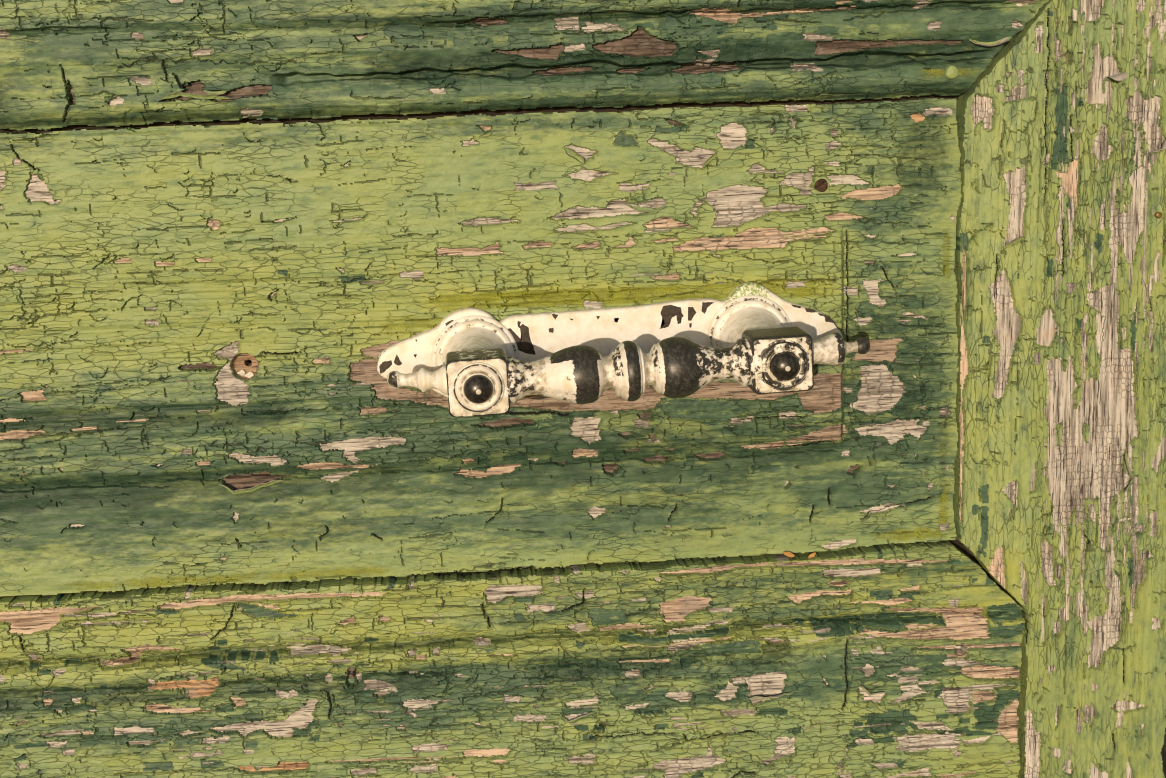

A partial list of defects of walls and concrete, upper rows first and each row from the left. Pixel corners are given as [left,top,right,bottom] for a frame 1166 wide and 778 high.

crack [61,66,72,118]
crack [1044,11,1073,274]
peeling [523,141,902,257]
peeling [660,302,714,329]
crack [843,234,851,342]
peeling [219,436,406,495]
crack [508,409,568,417]
peeling [478,338,926,475]
peeling [1003,283,1146,642]
crack [433,566,533,578]
peeling [653,539,1041,778]
crack [592,730,758,740]